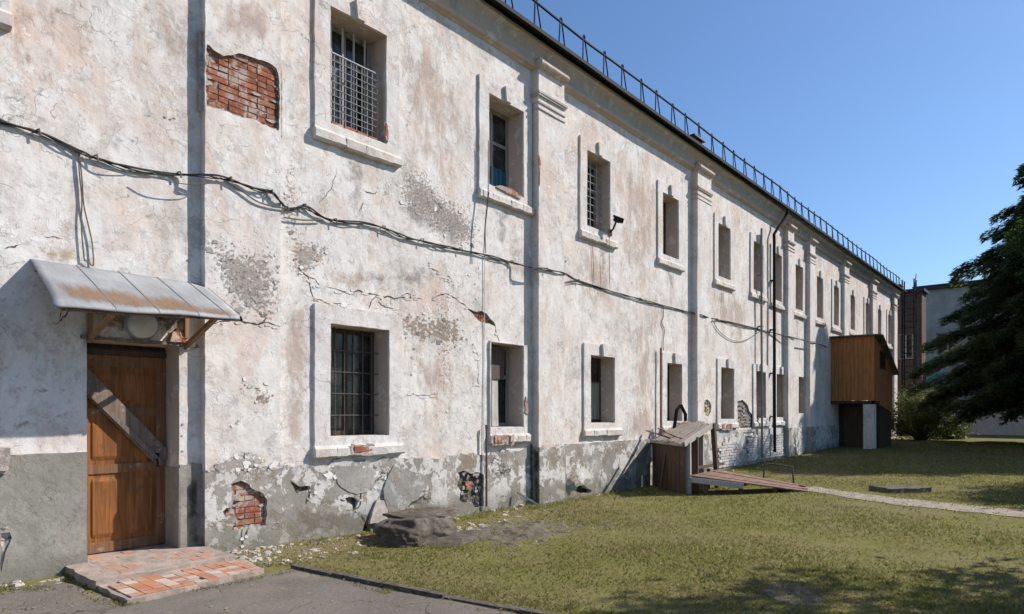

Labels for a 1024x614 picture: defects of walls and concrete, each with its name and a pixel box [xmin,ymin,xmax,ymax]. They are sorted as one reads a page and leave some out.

spalling [198,30,282,138]
flaking render [204,160,338,320]
flaking render [399,165,481,247]
corrosion [68,288,225,314]
crack [293,265,468,310]
flaking render [400,274,496,413]
flaking render [718,400,803,468]
spalling [209,449,286,530]
spalling [457,459,509,508]